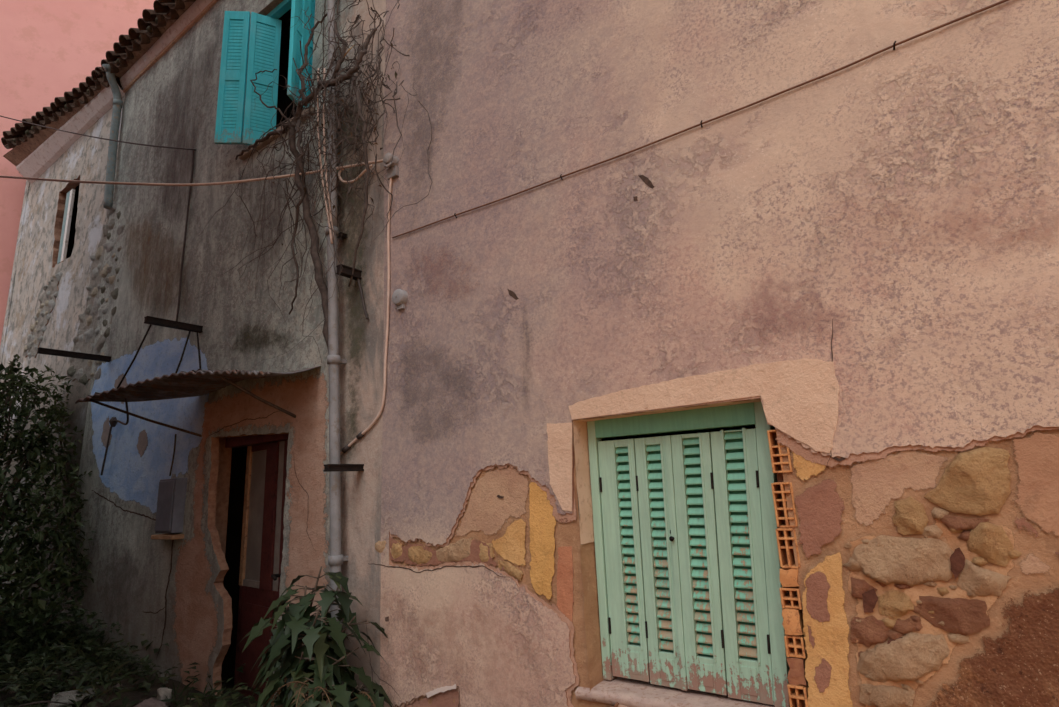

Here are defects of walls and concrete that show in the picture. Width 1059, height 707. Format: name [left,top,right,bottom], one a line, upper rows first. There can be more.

peeling [91,337,209,521]
spalling [372,467,574,623]
spalling [792,432,1059,707]
spalling [404,684,461,707]